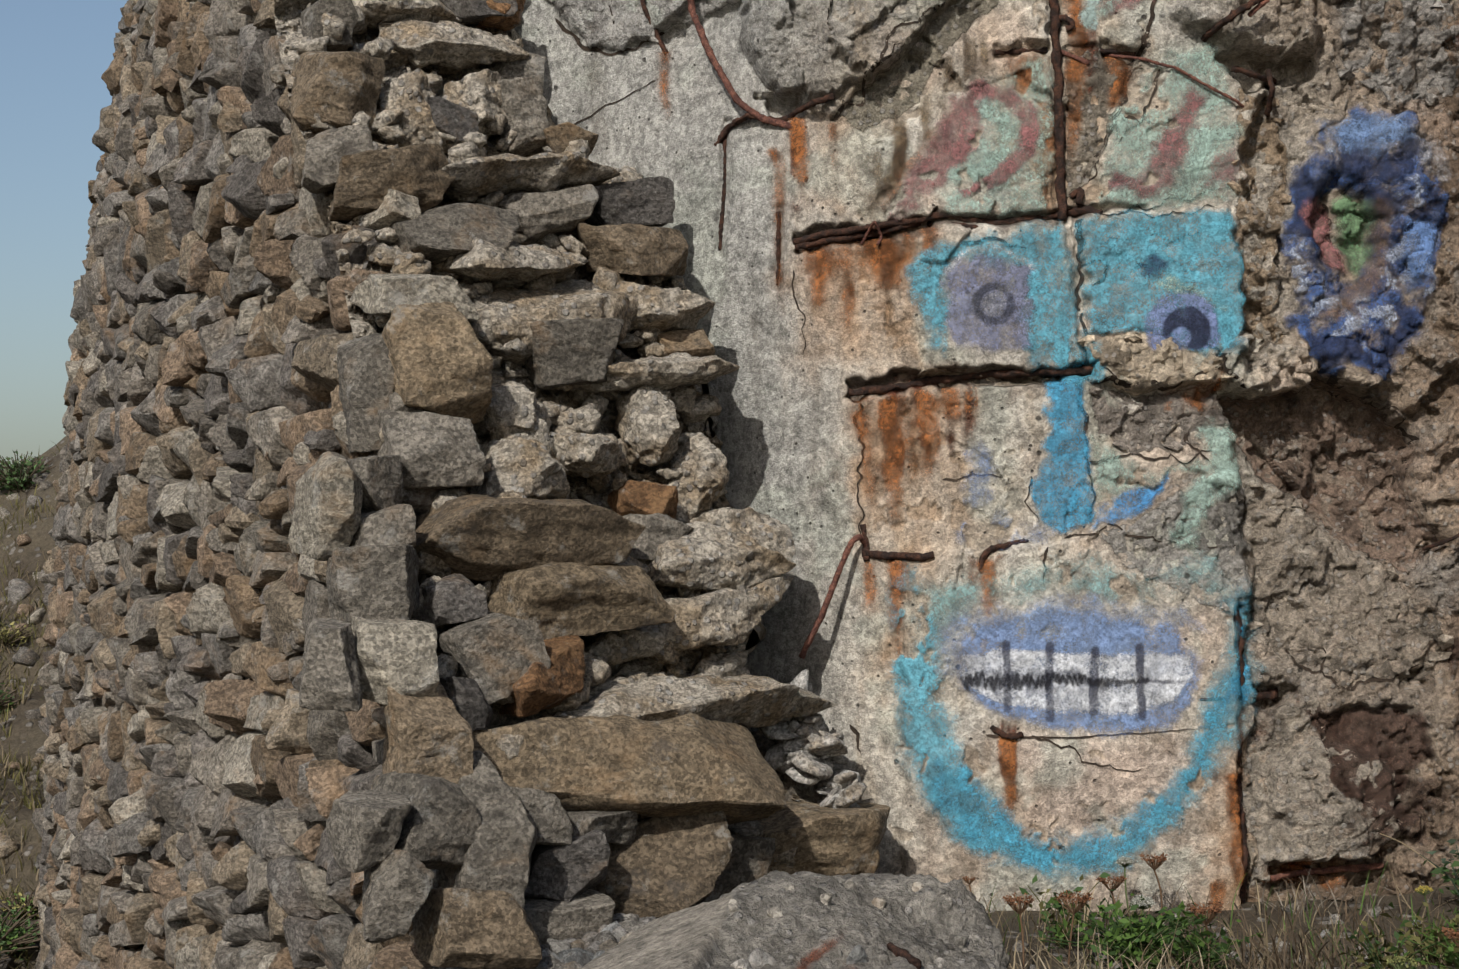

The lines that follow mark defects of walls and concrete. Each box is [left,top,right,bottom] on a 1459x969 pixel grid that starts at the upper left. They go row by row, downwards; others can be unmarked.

spalling [548,0,740,51]
spalling [839,0,998,132]
rust [687,0,1277,302]
crack [853,403,866,534]
rust [848,366,1094,516]
spalling [1076,331,1454,684]
rust [799,524,934,659]
rust [990,725,1024,812]
crack [986,729,1186,772]
rust [1200,610,1278,905]
spalling [1242,697,1402,889]
leakage [1306,705,1438,845]